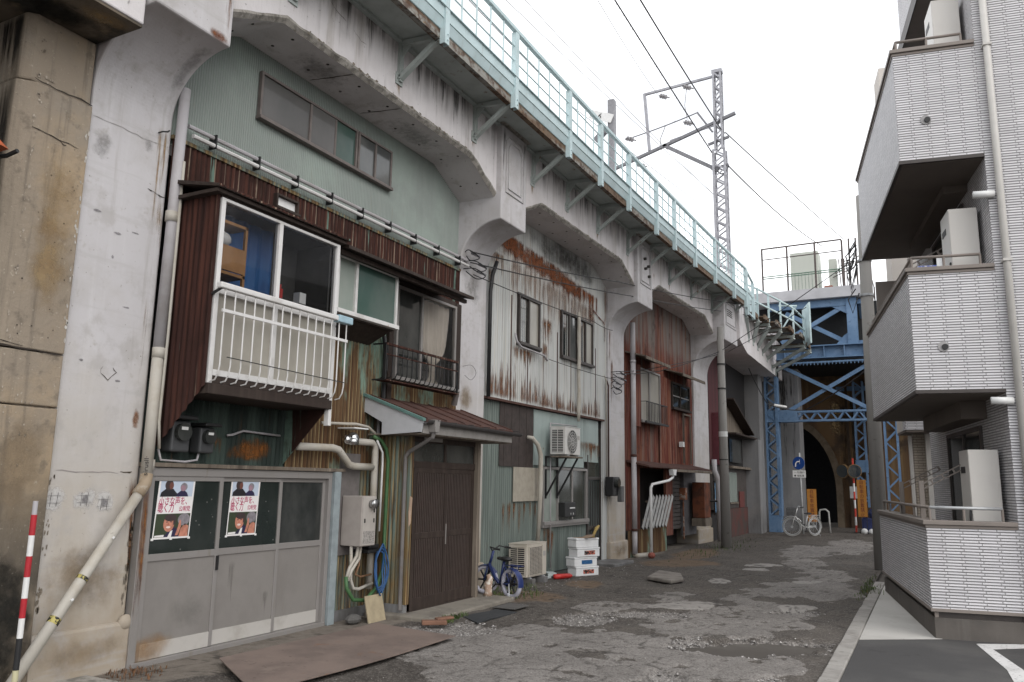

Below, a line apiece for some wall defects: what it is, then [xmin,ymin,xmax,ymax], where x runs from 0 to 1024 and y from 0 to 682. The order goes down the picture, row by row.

water stain [1,15,23,63]
crack [35,77,168,148]
water stain [418,62,465,118]
rust [489,238,613,399]
rust [490,369,599,416]
rust [236,442,268,460]